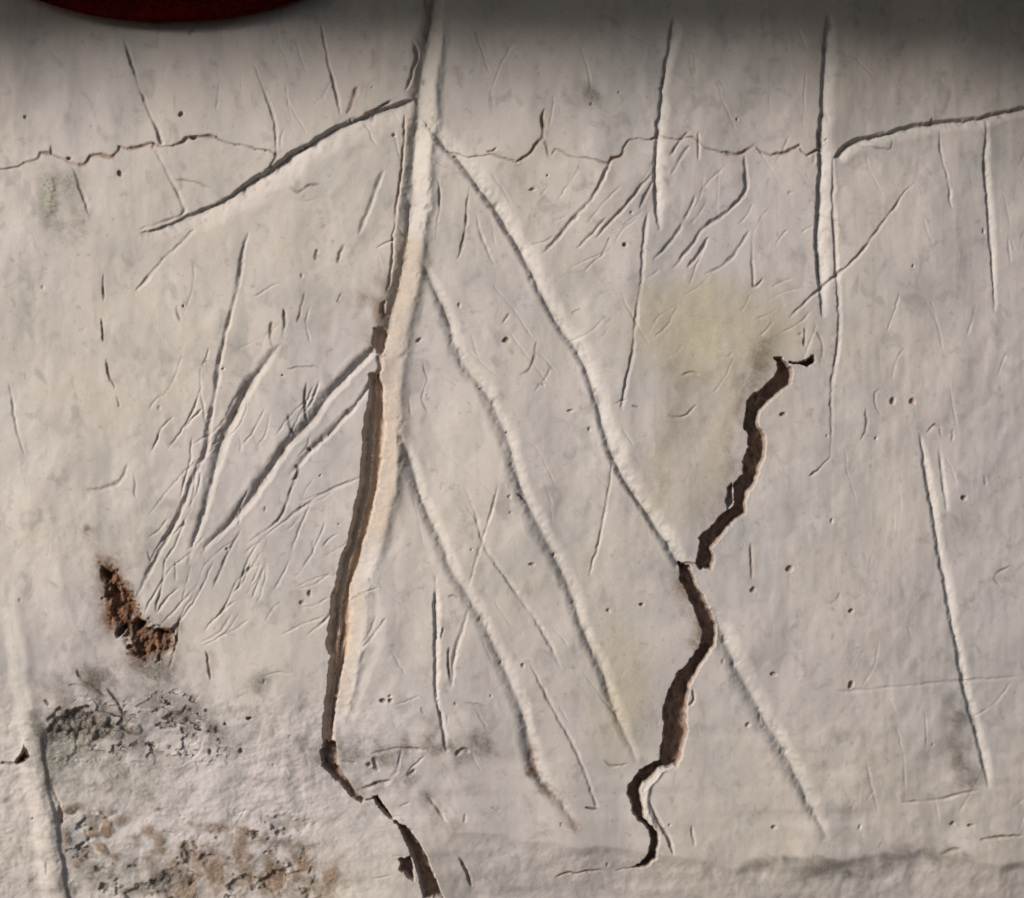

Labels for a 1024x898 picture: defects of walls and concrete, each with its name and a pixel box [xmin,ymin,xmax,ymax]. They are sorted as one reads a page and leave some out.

crack [405,0,435,90]
crack [0,134,279,171]
crack [175,179,213,189]
crack [447,109,819,165]
crack [319,115,448,898]
spalling [98,559,180,662]
crack [556,328,815,878]
crack [459,858,473,887]